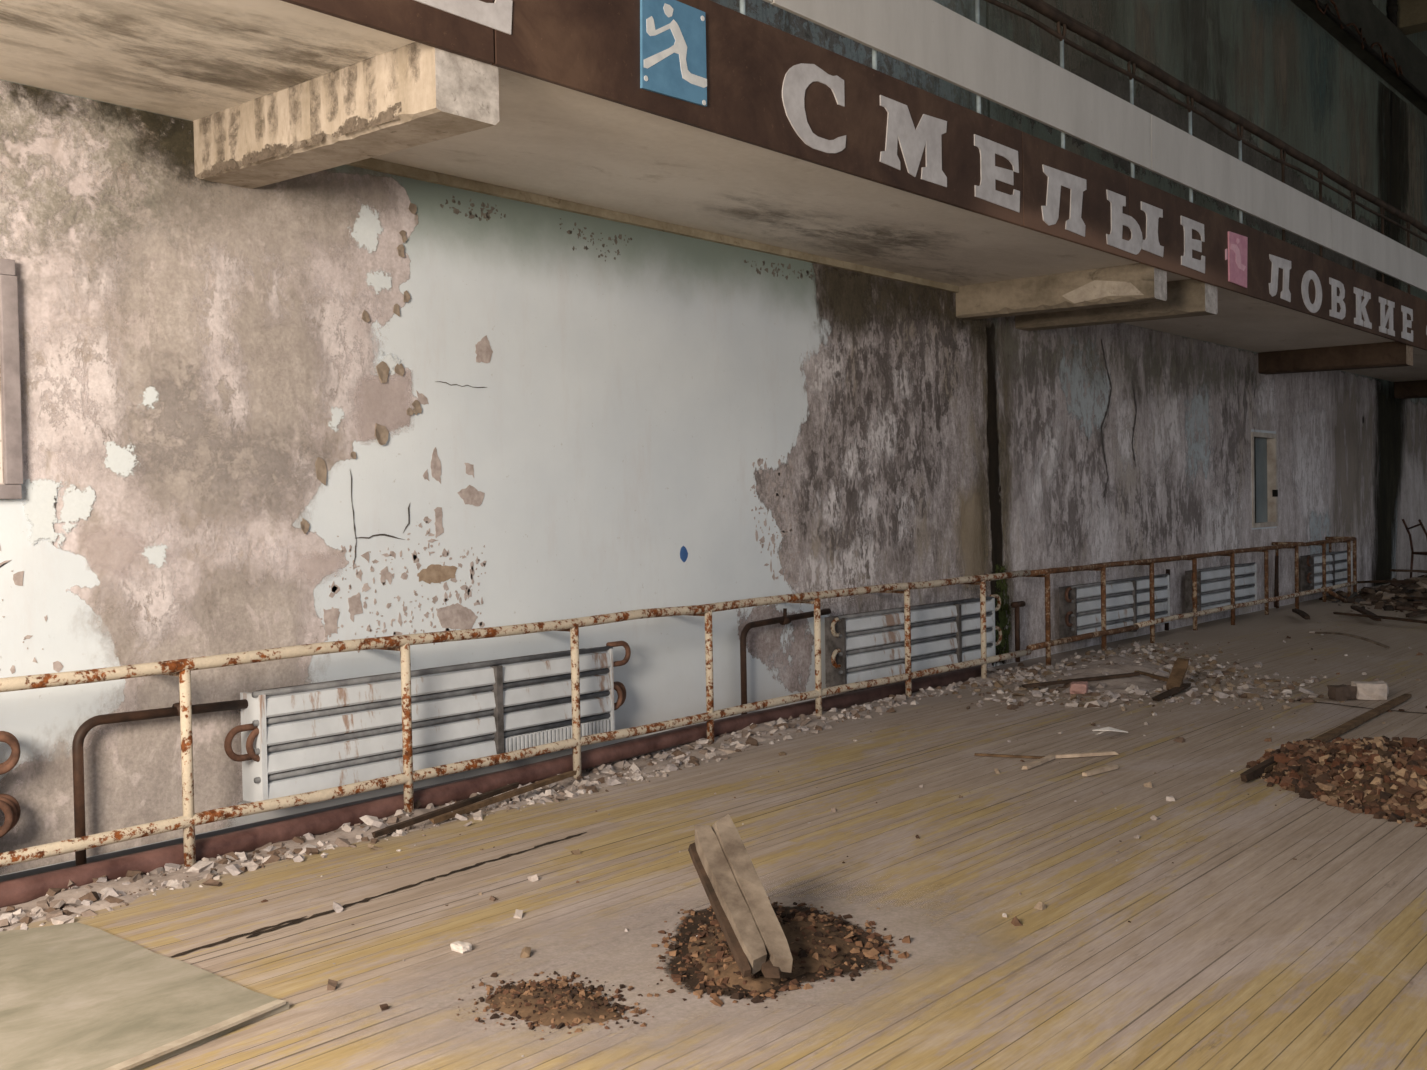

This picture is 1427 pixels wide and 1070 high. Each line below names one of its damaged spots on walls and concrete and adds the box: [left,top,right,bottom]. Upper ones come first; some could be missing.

damp [997,0,1108,79]
damp [1377,82,1422,254]
peeling [475,335,493,363]
damp [1376,271,1400,288]
peeling [0,80,486,875]
peeling [737,263,1381,697]
peeling [1396,398,1427,580]